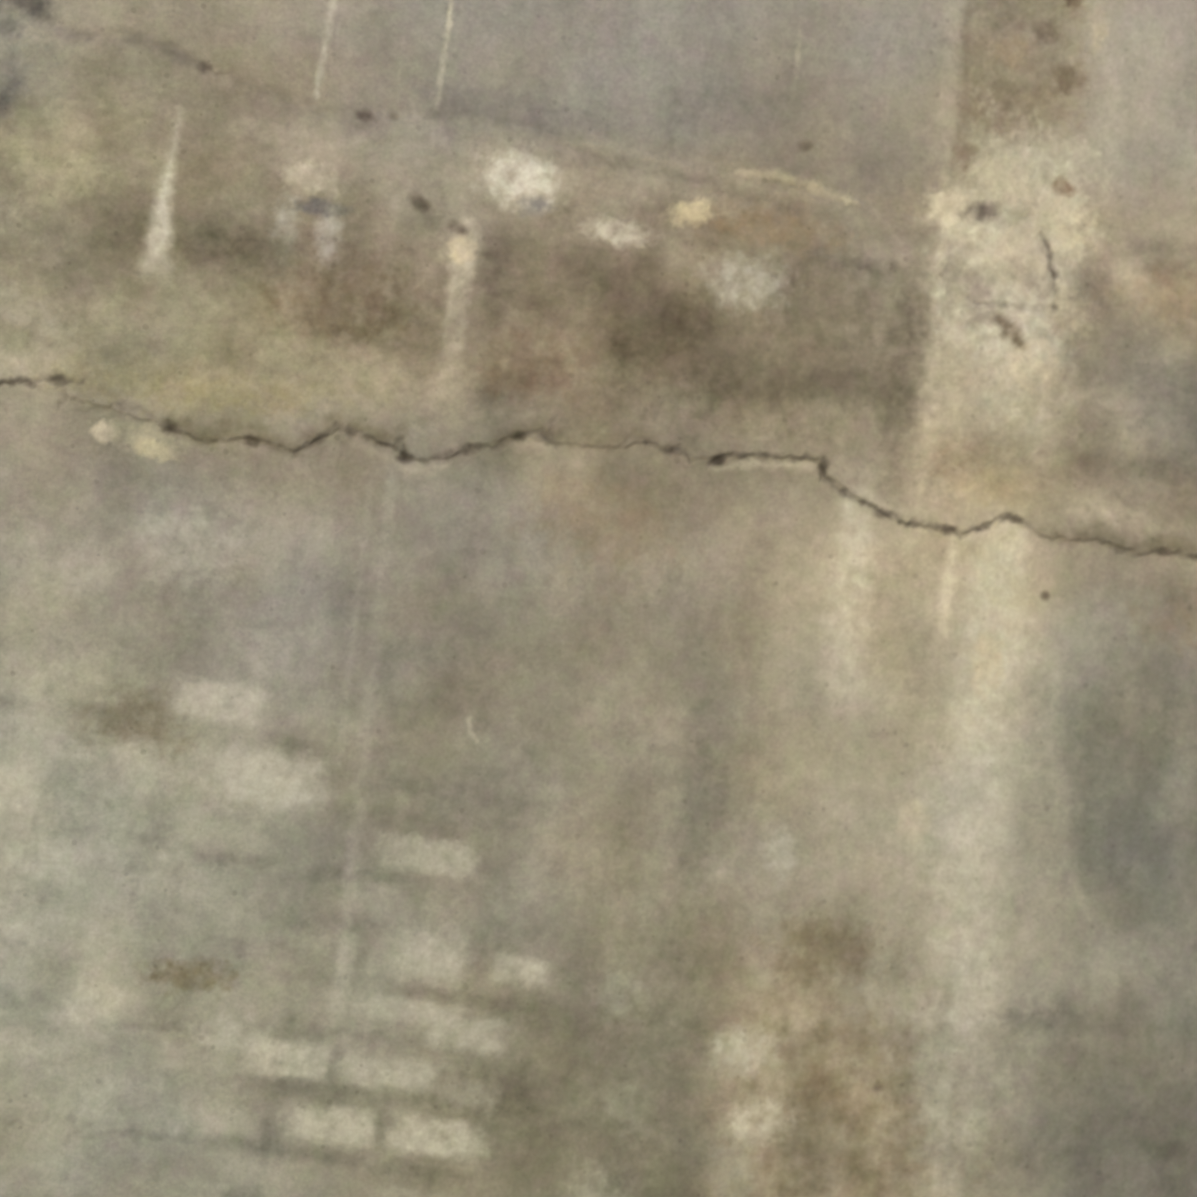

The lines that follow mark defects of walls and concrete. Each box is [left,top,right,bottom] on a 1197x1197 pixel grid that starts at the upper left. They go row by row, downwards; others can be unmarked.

crack [0,0,234,80]
water stain [131,103,188,290]
crack [272,84,378,121]
crack [422,95,740,194]
water stain [433,213,487,404]
water stain [626,237,931,450]
crack [0,367,1197,564]